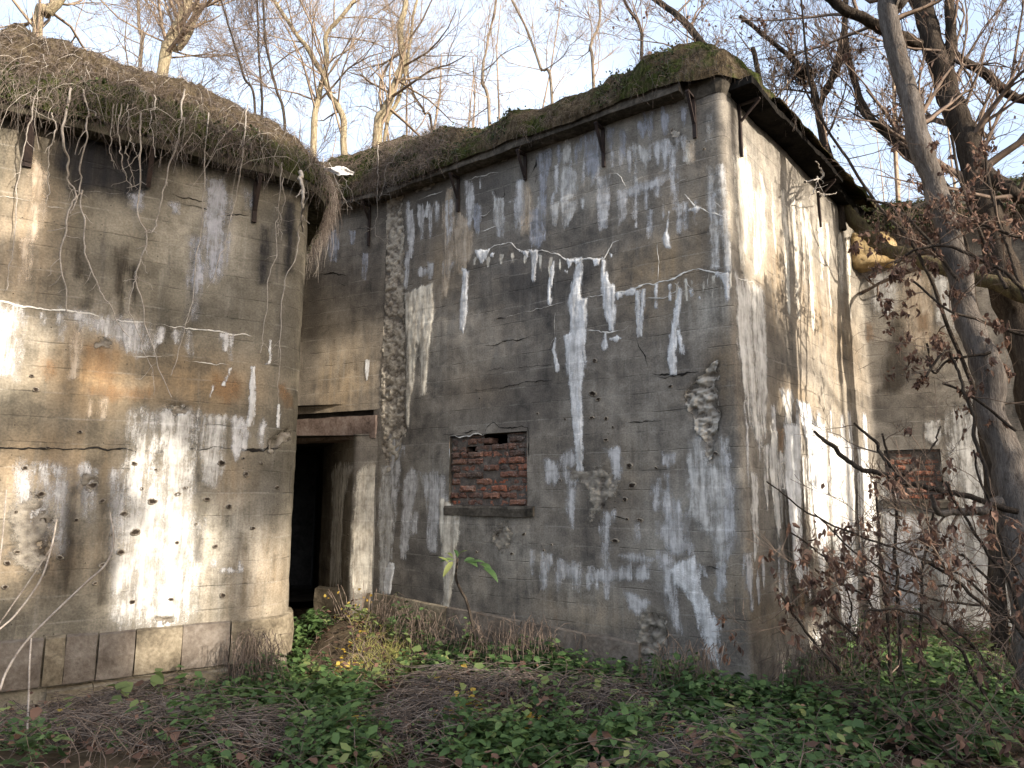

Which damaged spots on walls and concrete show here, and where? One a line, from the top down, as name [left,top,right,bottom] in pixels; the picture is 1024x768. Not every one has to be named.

corrosion [69,332,83,379]
crack [0,438,164,454]
leakage [74,259,189,353]
leakage [98,366,281,631]
crack [189,424,290,452]
spalling [380,195,407,473]
efflorescence [329,436,460,607]
spalling [558,461,636,523]
crack [590,249,755,308]
leakage [404,106,991,670]
spalling [684,360,721,461]
spalling [636,612,668,665]